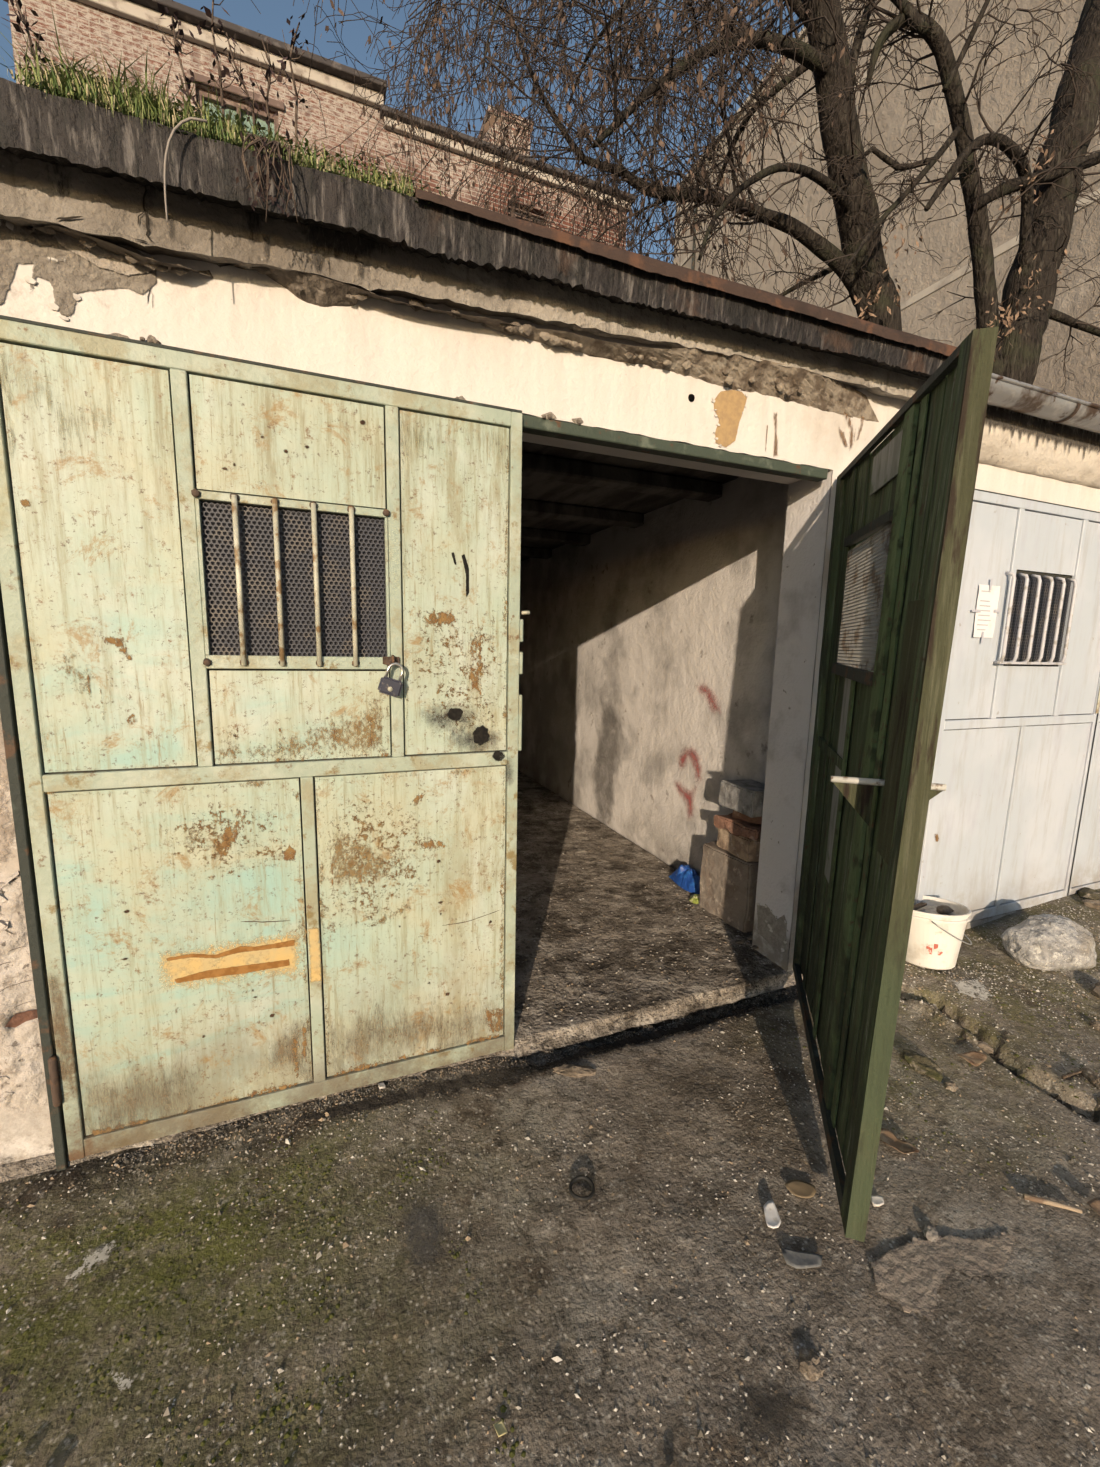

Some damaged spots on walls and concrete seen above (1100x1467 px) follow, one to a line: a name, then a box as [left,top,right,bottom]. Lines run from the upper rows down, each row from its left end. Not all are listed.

spalling [0,221,879,447]
rust [219,699,388,765]
rust [414,589,508,731]
rust [92,925,504,1136]
rust [160,781,445,988]
peeling [756,903,788,953]